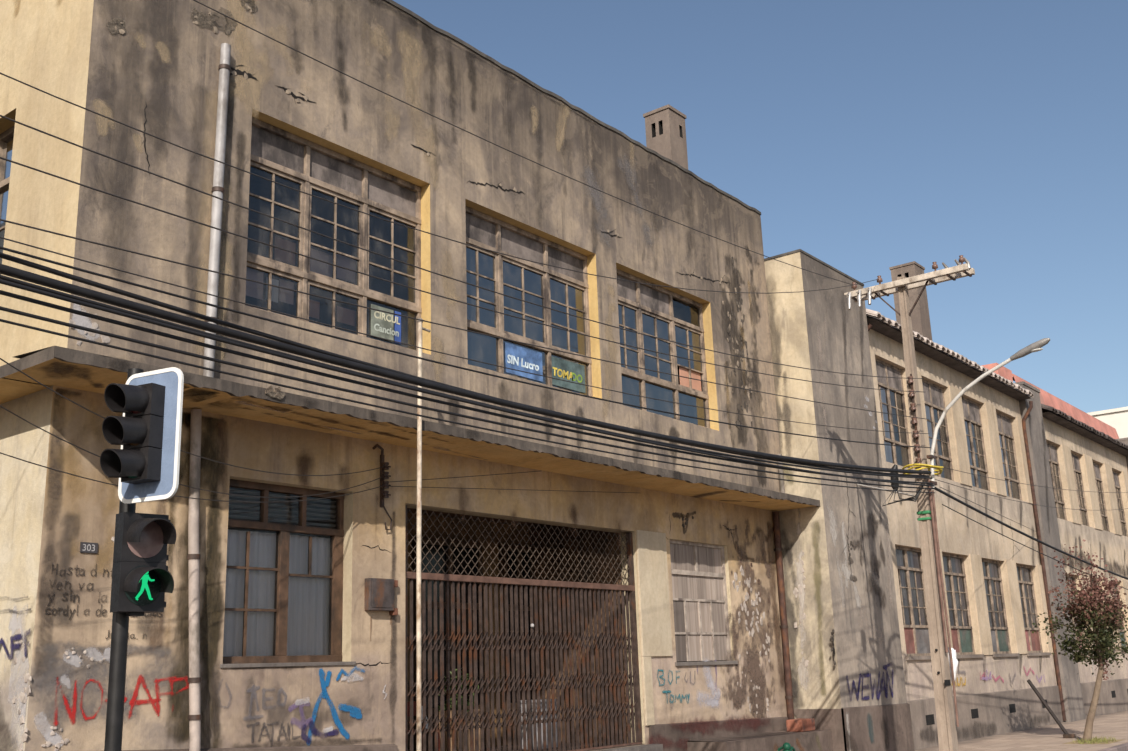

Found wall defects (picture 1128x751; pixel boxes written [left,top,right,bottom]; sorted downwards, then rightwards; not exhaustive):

spalling [191,8,237,35]
water stain [228,0,245,124]
crack [230,65,316,103]
crack [141,104,150,175]
crack [468,181,523,193]
water stain [189,136,243,363]
water stain [44,363,102,403]
water stain [243,399,423,440]
water stain [35,434,110,719]
water stain [127,375,223,749]
peeling [724,521,775,718]
peeling [61,648,110,687]